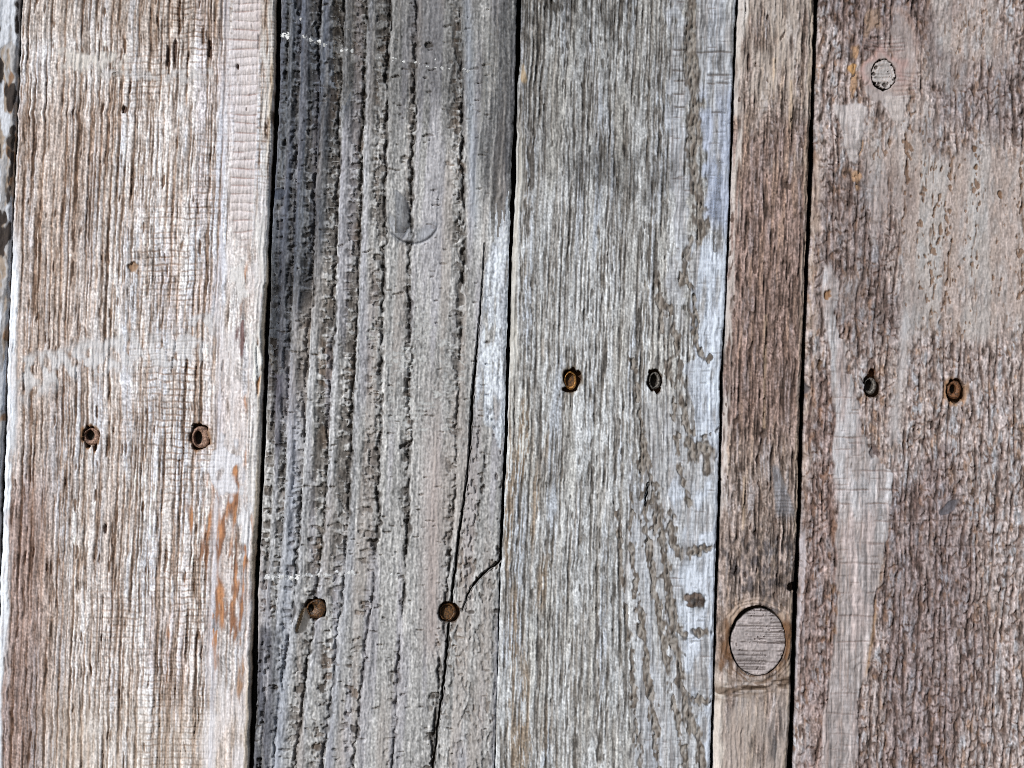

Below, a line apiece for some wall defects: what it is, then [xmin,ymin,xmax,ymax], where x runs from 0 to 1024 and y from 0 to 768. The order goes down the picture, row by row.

corrosion [201,464,248,651]
crack [431,243,501,768]